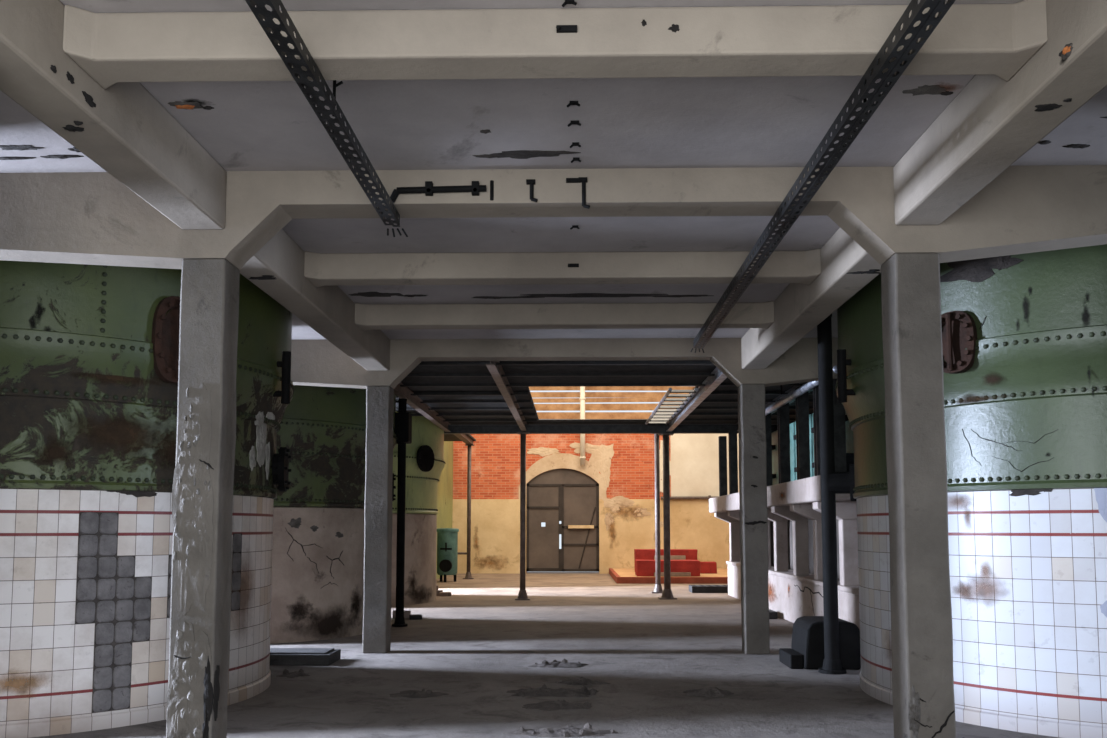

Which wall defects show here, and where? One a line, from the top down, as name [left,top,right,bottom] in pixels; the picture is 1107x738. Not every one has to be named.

flaking render [527,442,663,531]
peeling [1094,488,1107,522]
crack [286,530,344,587]
corrosion [958,567,994,597]
water stain [292,593,361,638]
spalling [202,657,220,738]